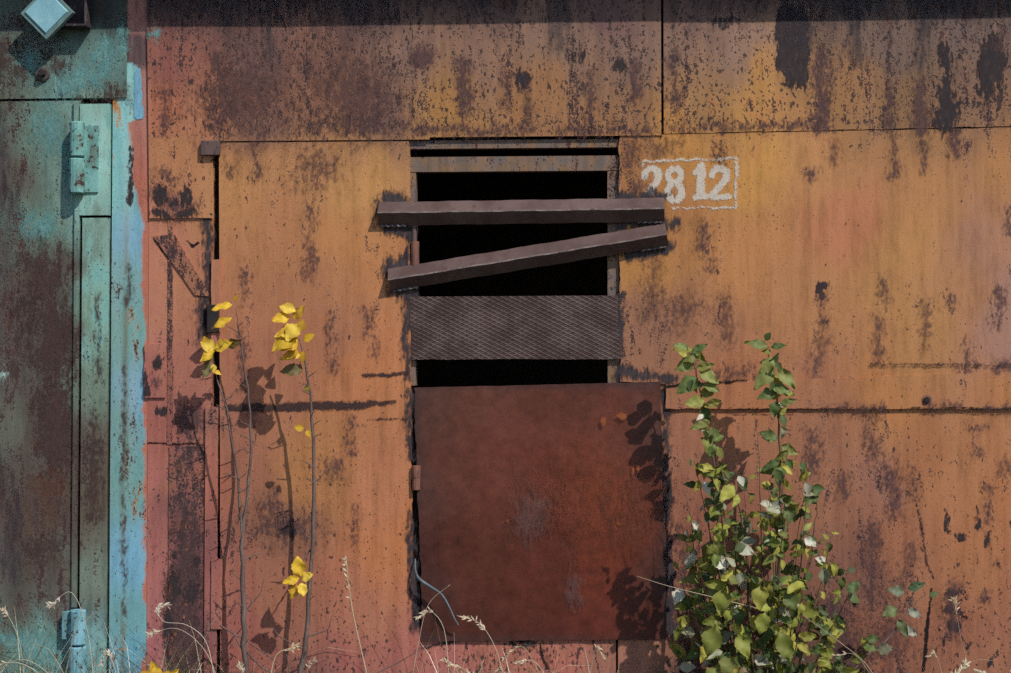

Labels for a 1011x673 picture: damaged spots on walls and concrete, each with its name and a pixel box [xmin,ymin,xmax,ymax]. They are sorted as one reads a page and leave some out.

rust [712,15,740,30]
rust [180,52,286,185]
rust [296,43,535,140]
rust [556,48,820,197]
rust [910,41,963,170]
rust [974,24,1009,106]
rust [142,352,164,396]
rust [155,402,205,438]
rust [248,491,323,549]
rust [824,409,920,673]
rust [944,485,996,548]
peeling [0,628,66,673]